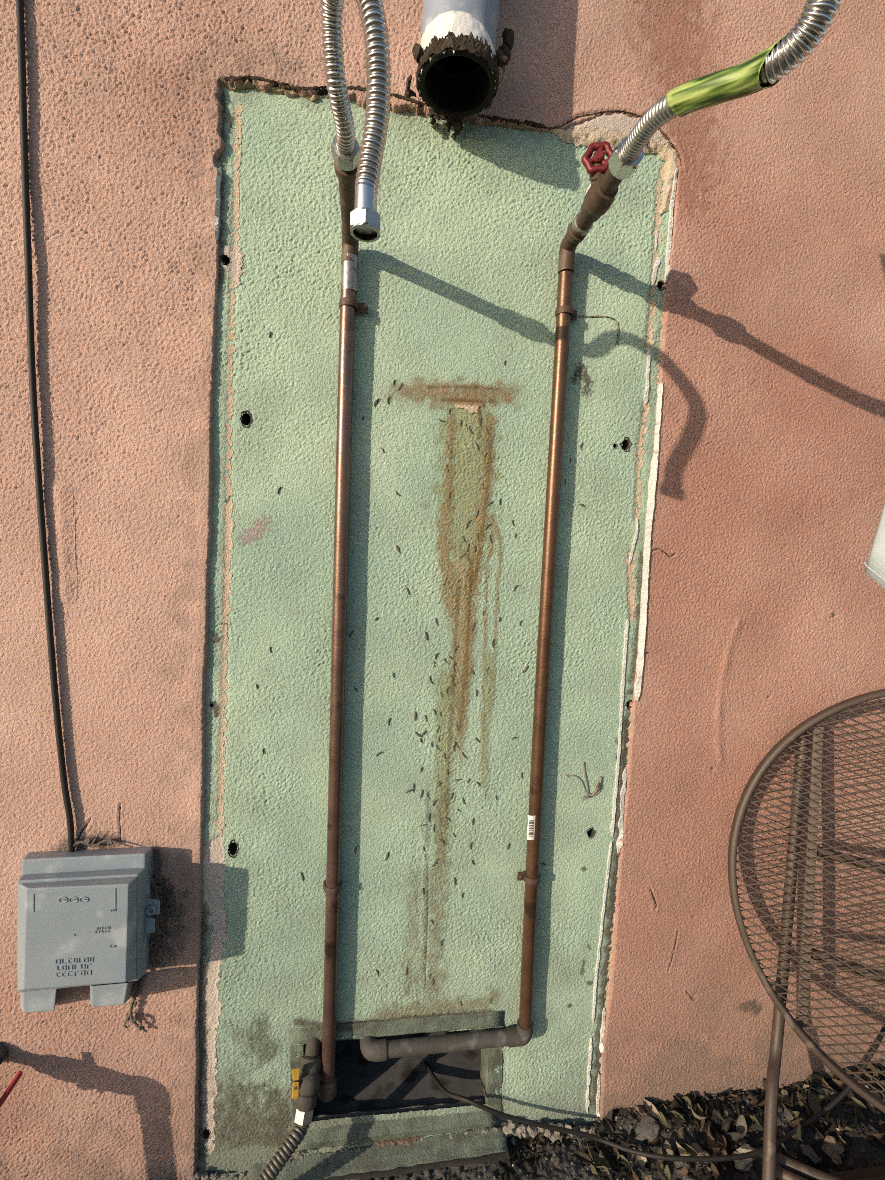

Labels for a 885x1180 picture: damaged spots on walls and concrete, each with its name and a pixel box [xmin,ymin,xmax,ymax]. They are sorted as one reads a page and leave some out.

spalling [390,43,426,114]
peeling [477,113,641,151]
rust [390,377,514,862]
peeling [450,130,679,1143]
leakage [58,835,116,851]
leakage [150,850,184,970]
leakage [197,909,290,1161]